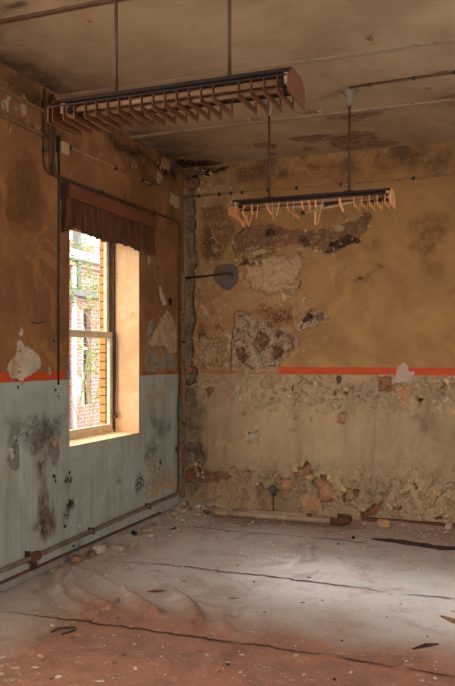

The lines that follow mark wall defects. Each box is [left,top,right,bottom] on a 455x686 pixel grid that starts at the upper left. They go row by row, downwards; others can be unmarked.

flaking render [169,184,372,386]
peeling [7,435,21,471]
rust [39,493,55,539]
flaking render [274,459,402,517]
crack [108,561,386,592]
crack [0,611,455,677]